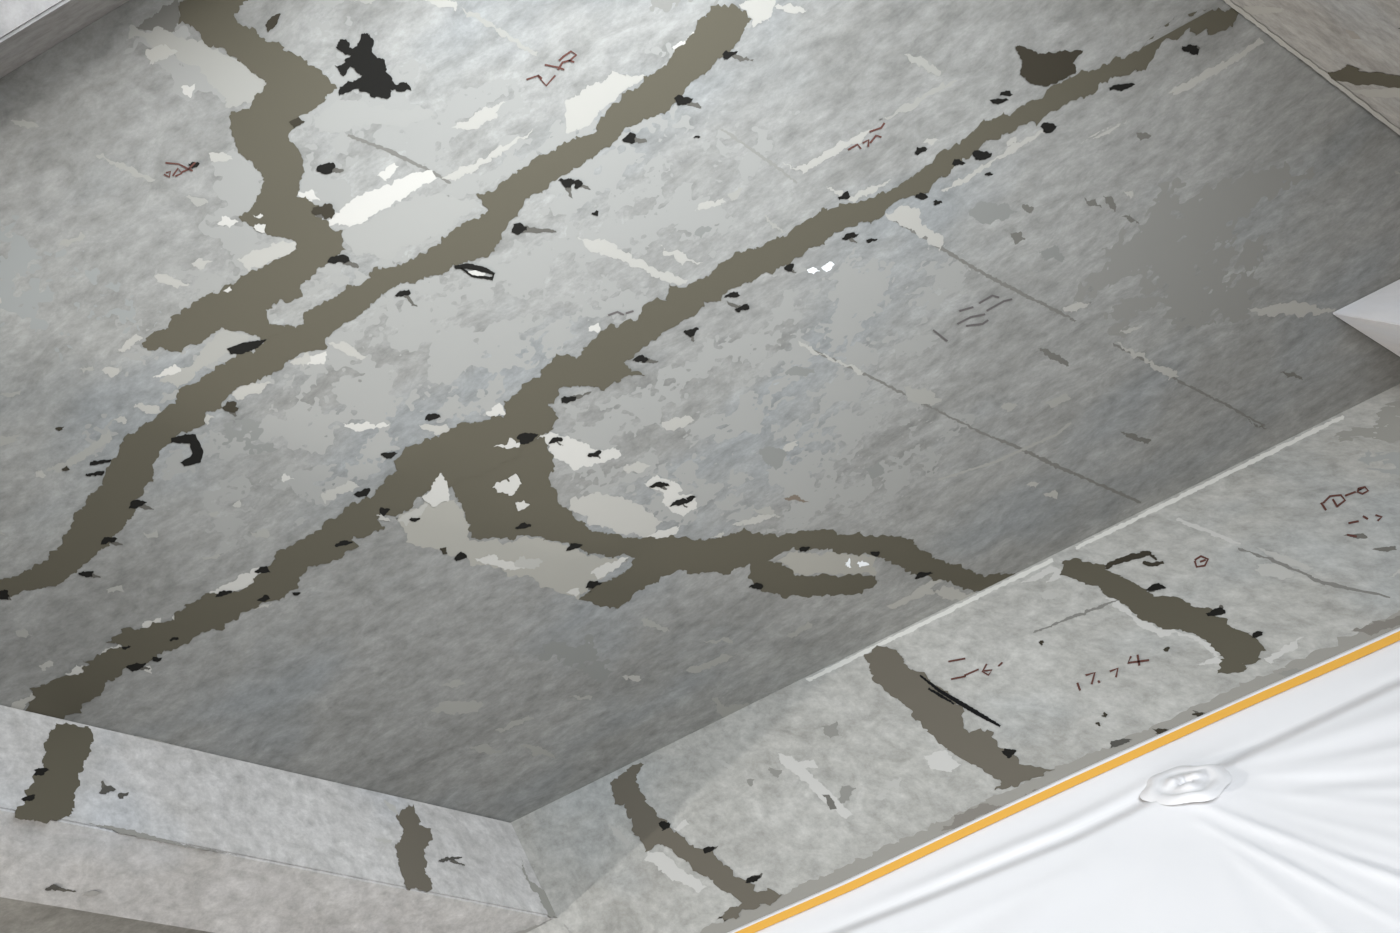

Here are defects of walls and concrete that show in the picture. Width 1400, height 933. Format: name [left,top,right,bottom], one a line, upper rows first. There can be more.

hole [336,33,411,99]
hole [1016,45,1083,87]
crack [920,675,1001,727]